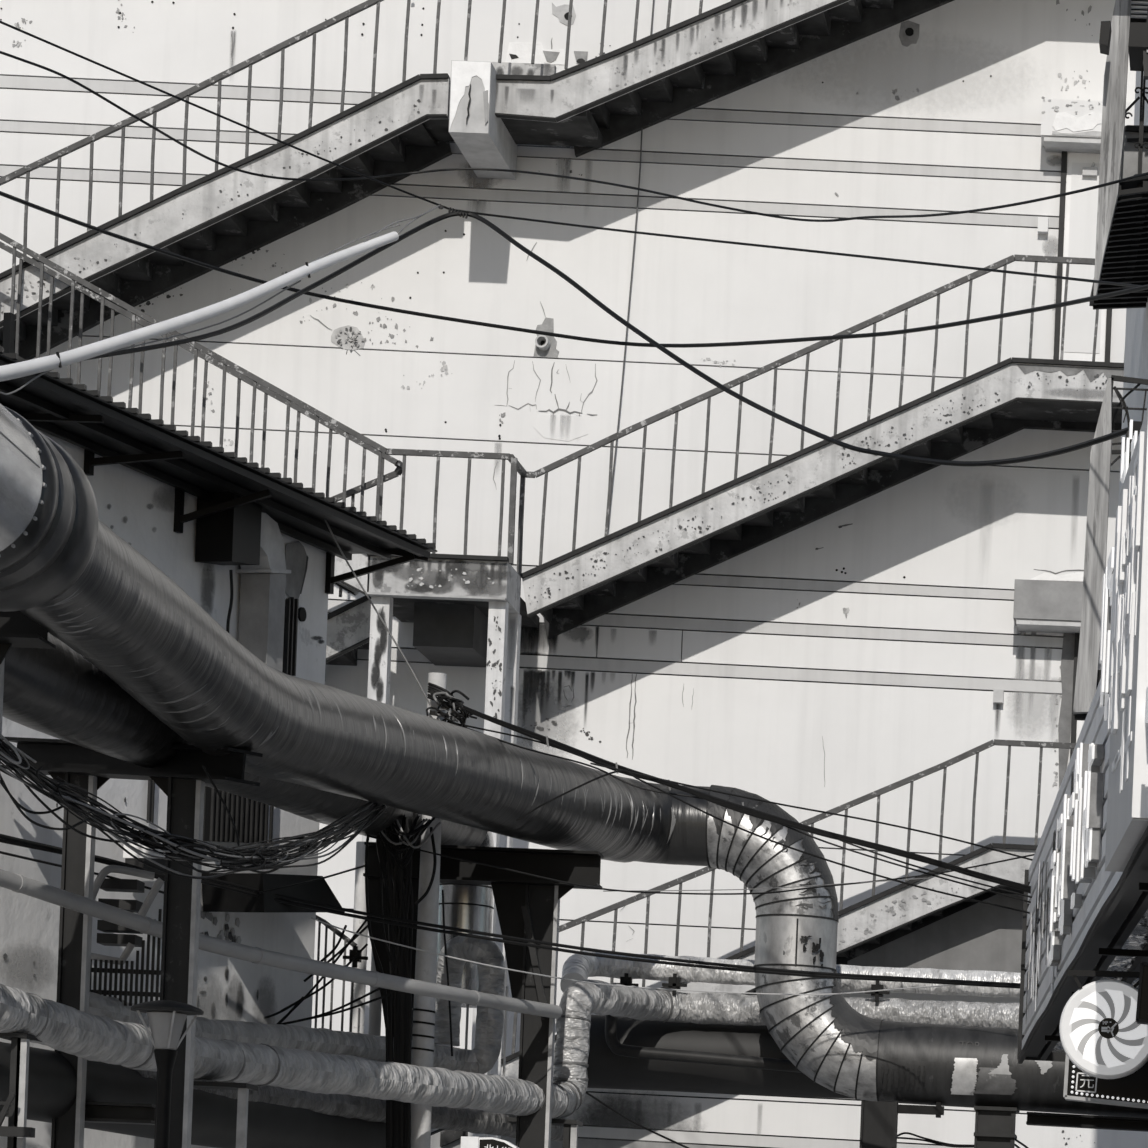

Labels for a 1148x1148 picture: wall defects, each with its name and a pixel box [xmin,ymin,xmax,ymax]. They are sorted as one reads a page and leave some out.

rust [733,0,789,28]
crack [500,360,598,441]
peeling [407,568,470,589]
rust [528,508,722,604]
water stain [520,623,599,734]
water stain [1016,619,1081,681]